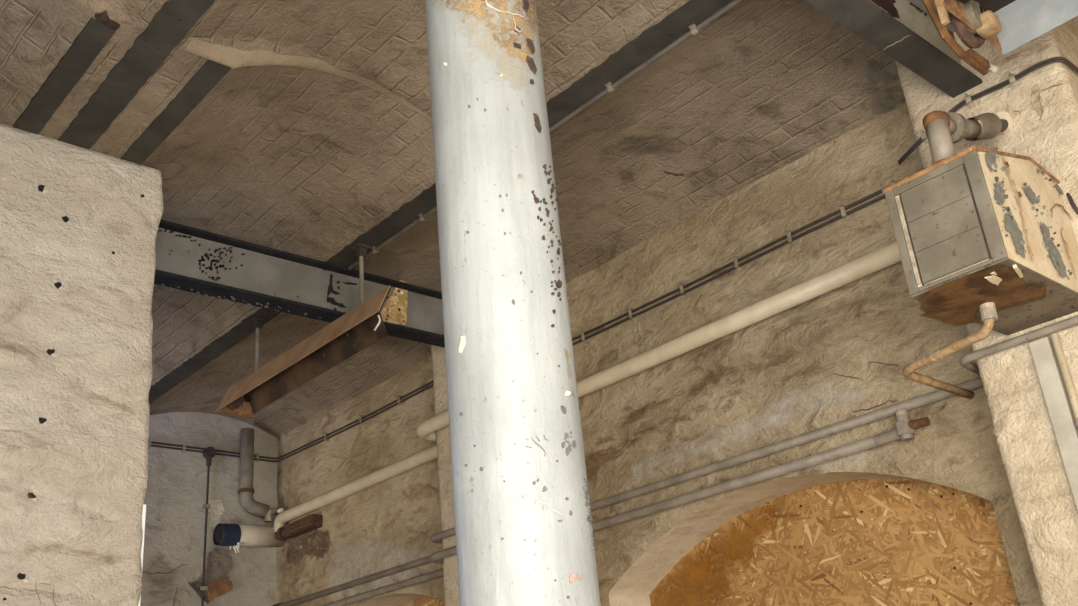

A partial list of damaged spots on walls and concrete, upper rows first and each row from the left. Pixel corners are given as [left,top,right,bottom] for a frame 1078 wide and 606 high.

rust [447,0,537,76]
peeling [158,229,273,281]
peeling [531,164,562,327]
peeling [323,269,358,310]
crack [35,583,57,606]